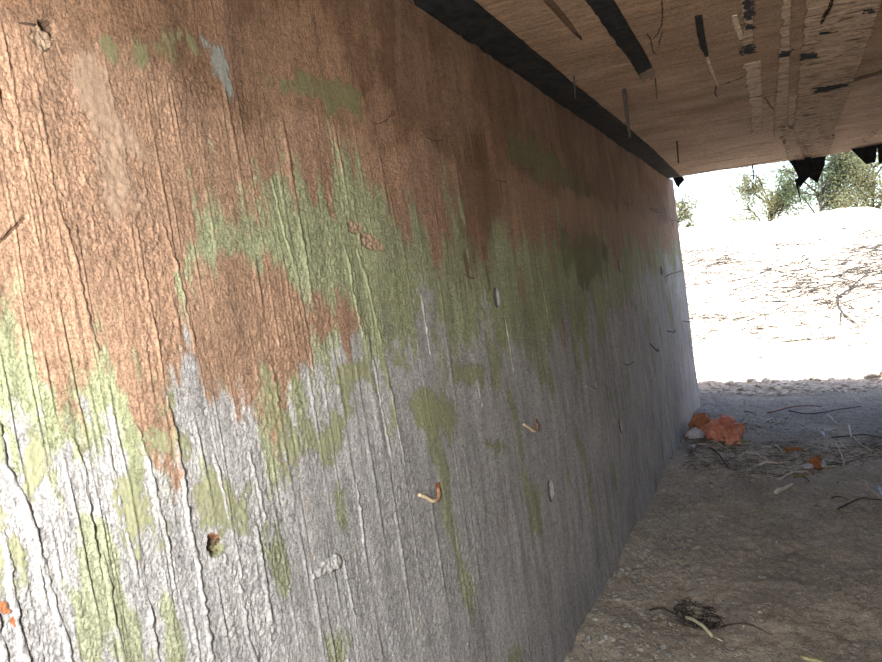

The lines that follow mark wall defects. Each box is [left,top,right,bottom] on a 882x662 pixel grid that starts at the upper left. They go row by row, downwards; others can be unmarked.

water stain [70,41,152,226]